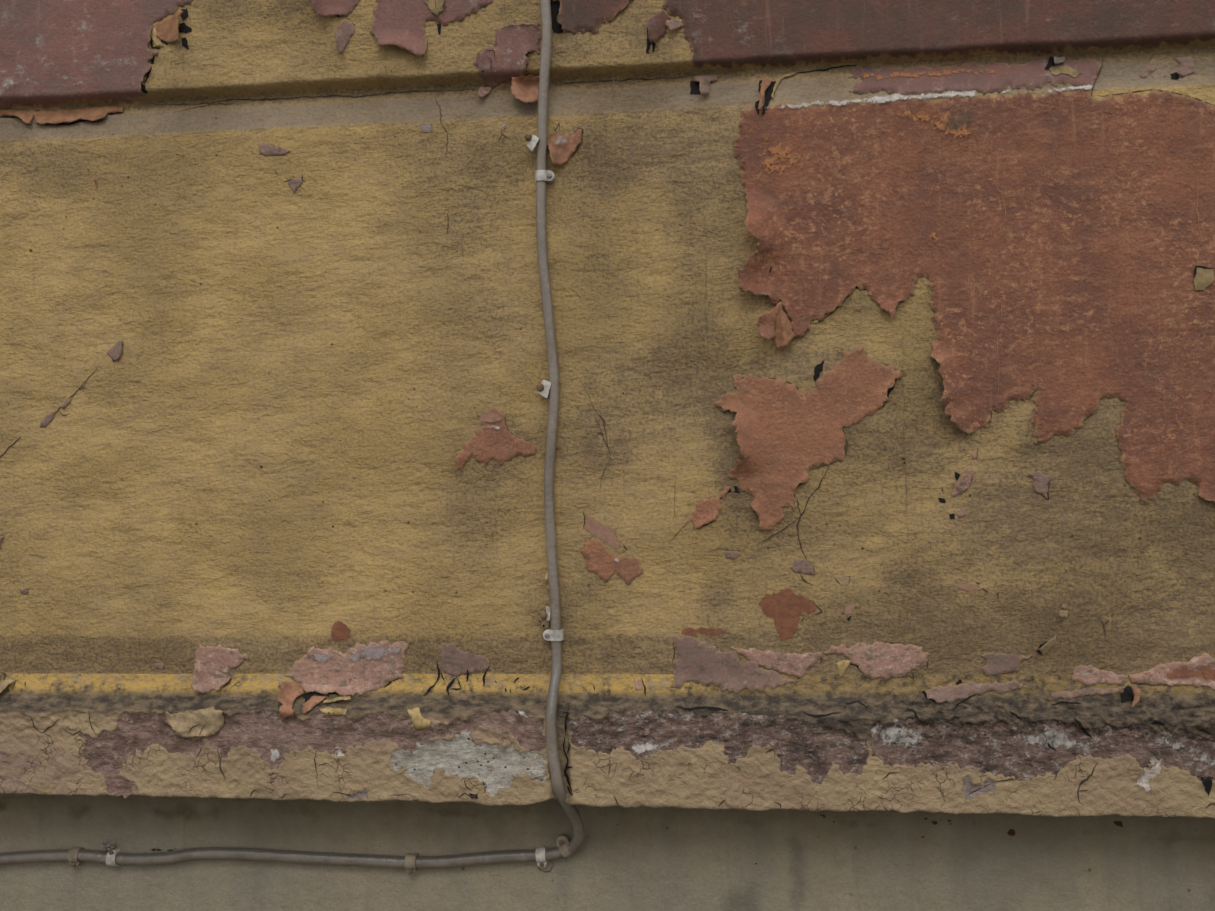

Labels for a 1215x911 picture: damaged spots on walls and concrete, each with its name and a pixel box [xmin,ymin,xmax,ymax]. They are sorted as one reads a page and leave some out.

peeling [473,0,634,103]
peeling [646,0,1215,504]
peeling [672,346,902,540]
crack [21,713,96,744]
crack [196,747,289,798]
peeling [79,640,548,799]
crack [563,712,573,796]
crack [675,704,727,712]
crack [804,701,868,717]
peeling [671,635,1033,704]
peeling [567,678,1215,800]
crack [969,701,1098,805]